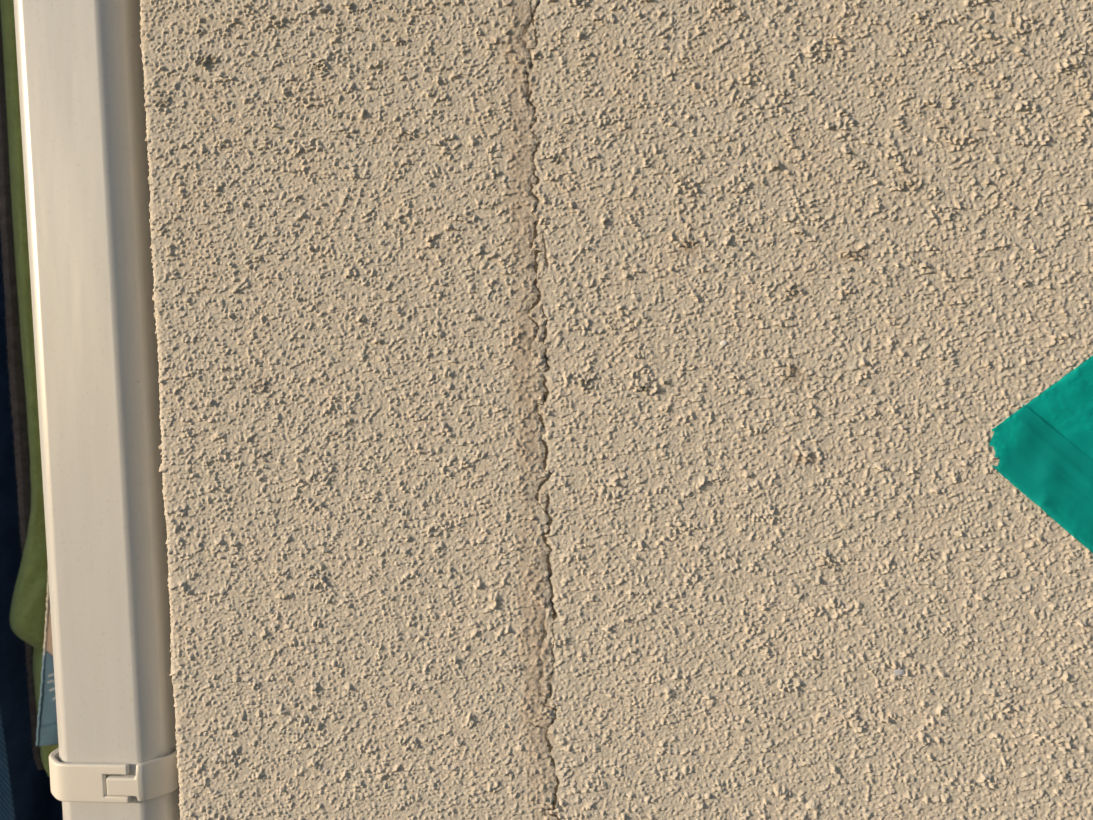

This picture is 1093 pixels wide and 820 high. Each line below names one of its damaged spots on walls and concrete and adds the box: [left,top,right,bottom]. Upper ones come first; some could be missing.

crack [521,0,560,820]